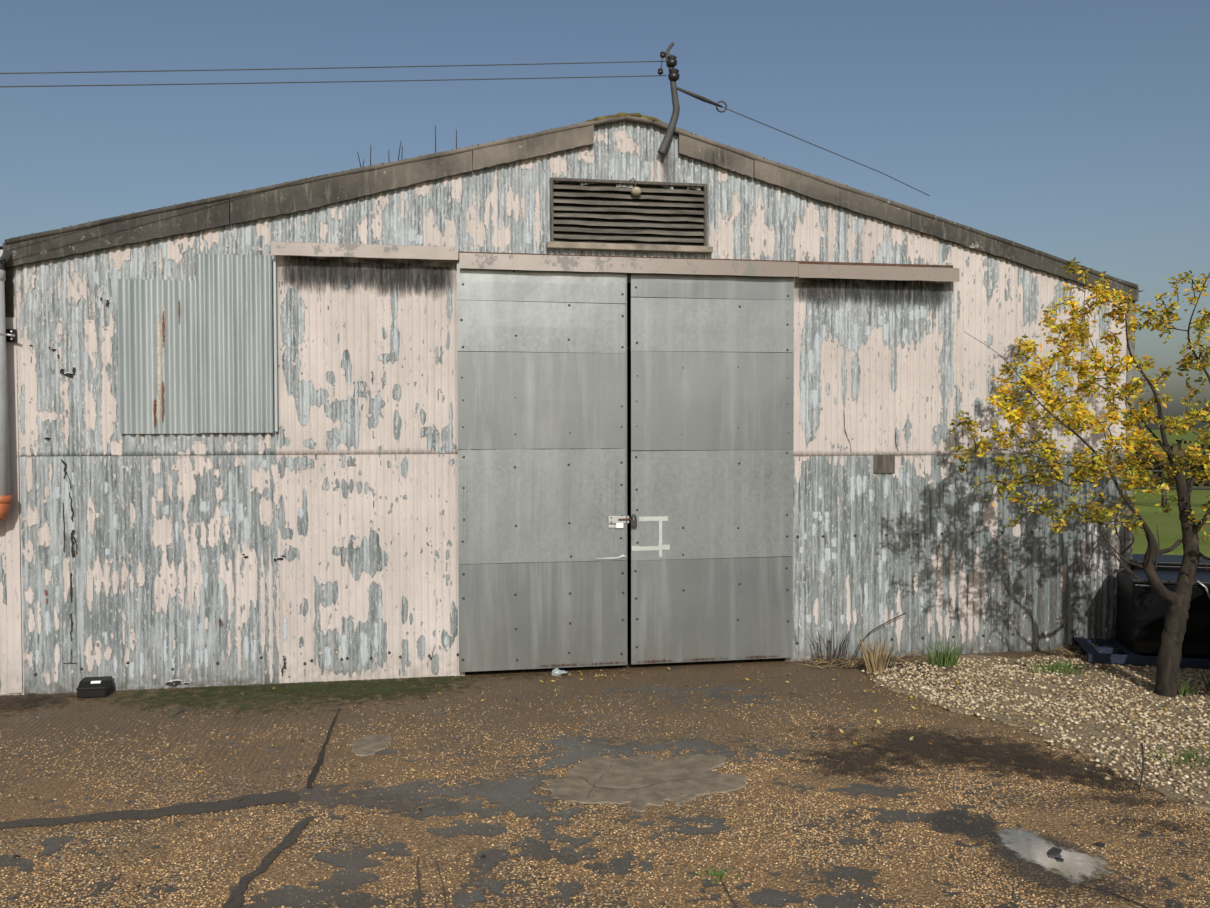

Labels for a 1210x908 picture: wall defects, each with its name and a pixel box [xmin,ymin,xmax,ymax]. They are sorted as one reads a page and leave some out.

damp [285,258,449,289]
damp [799,278,943,428]
corrosion [153,381,165,427]
peeling [16,130,1125,692]
damp [55,472,75,530]
peeling [1138,819,1209,847]